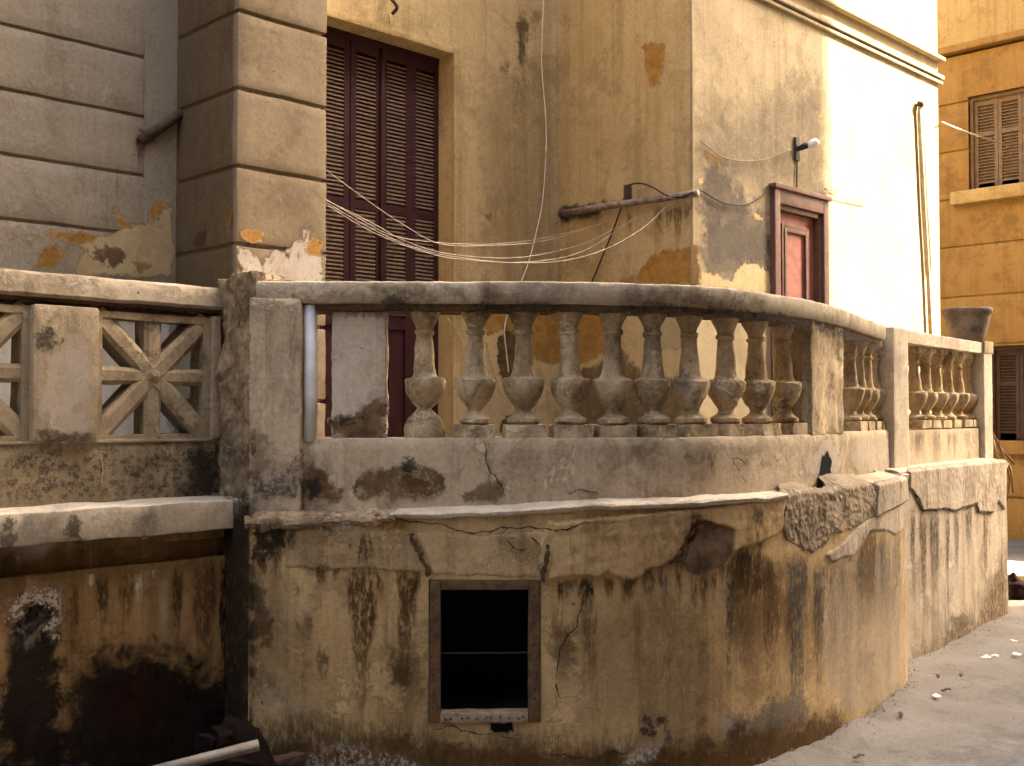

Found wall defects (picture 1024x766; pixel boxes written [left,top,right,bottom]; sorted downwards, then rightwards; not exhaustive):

peeling [642,42,666,88]
peeling [8,200,175,279]
peeling [636,244,771,293]
damp [37,326,64,353]
spalling [215,204,326,506]
peeling [482,314,516,434]
damp [0,429,843,766]
crack [396,438,676,582]
spalling [669,521,734,575]
peeling [825,502,906,563]
damp [841,535,897,598]
crack [555,592,584,709]